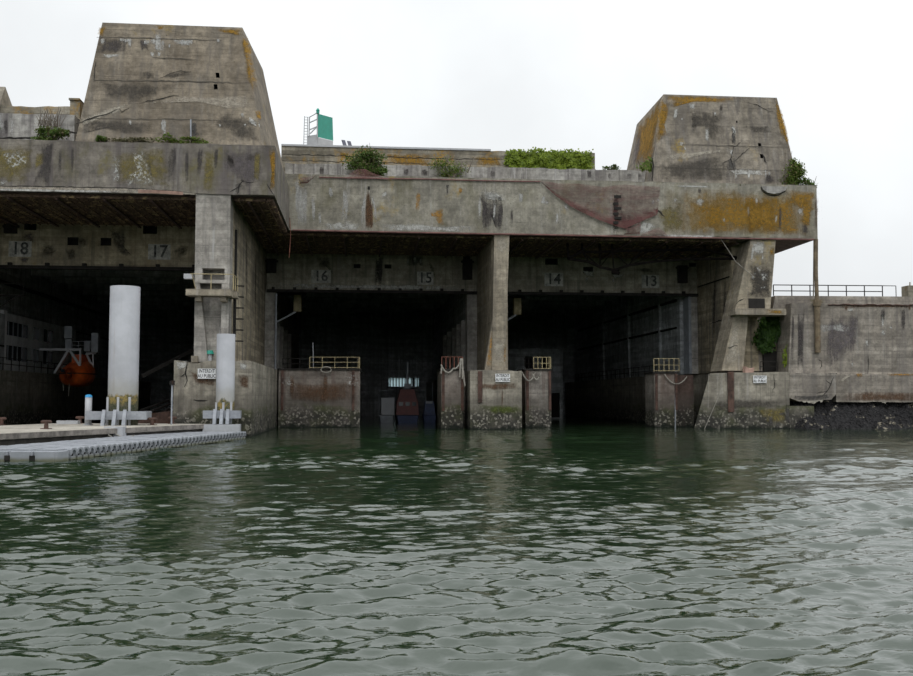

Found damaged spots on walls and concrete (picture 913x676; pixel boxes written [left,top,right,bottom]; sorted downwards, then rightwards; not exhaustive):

damp [101,36,192,52]
damp [243,40,256,82]
damp [108,73,158,99]
crack [69,37,247,134]
crack [0,134,35,142]
damp [87,121,141,132]
damp [219,114,256,139]
damp [35,144,73,182]
crack [2,186,194,194]
corrosion [613,195,621,230]